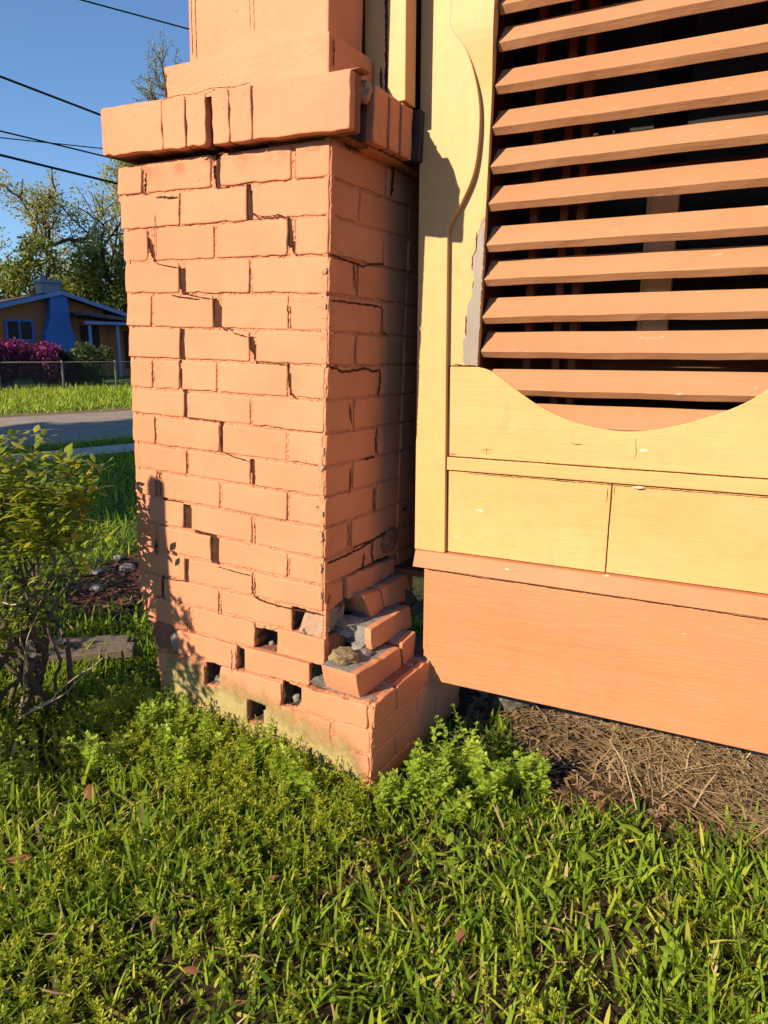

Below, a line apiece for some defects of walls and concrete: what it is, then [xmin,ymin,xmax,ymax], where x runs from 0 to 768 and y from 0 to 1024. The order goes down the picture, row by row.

crack [161,73,299,256]
crack [141,171,297,399]
crack [330,254,386,334]
peeling [453,218,485,366]
crack [180,329,256,484]
crack [154,471,321,615]
crack [328,405,394,569]
peeling [207,662,222,684]
peeling [252,701,266,721]
peeling [257,628,278,650]
peeling [285,681,302,705]
peeling [294,607,307,630]